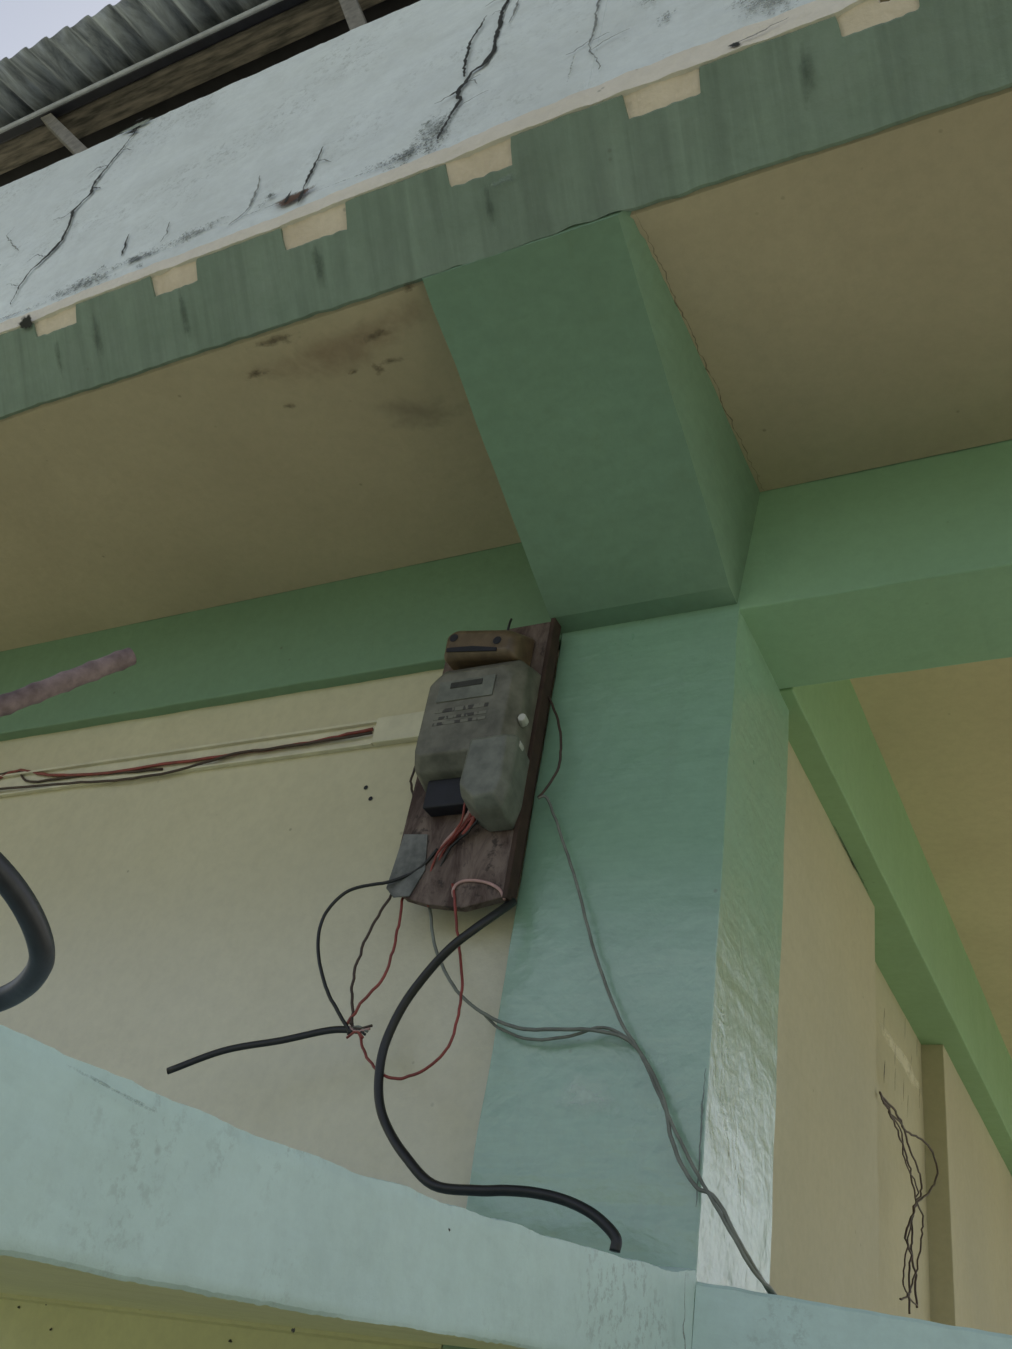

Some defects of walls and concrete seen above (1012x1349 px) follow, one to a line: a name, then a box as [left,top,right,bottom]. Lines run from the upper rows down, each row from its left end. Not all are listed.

crack [566,0,625,68]
crack [437,0,519,139]
crack [7,126,139,304]
crack [230,176,260,224]
crack [303,147,331,190]